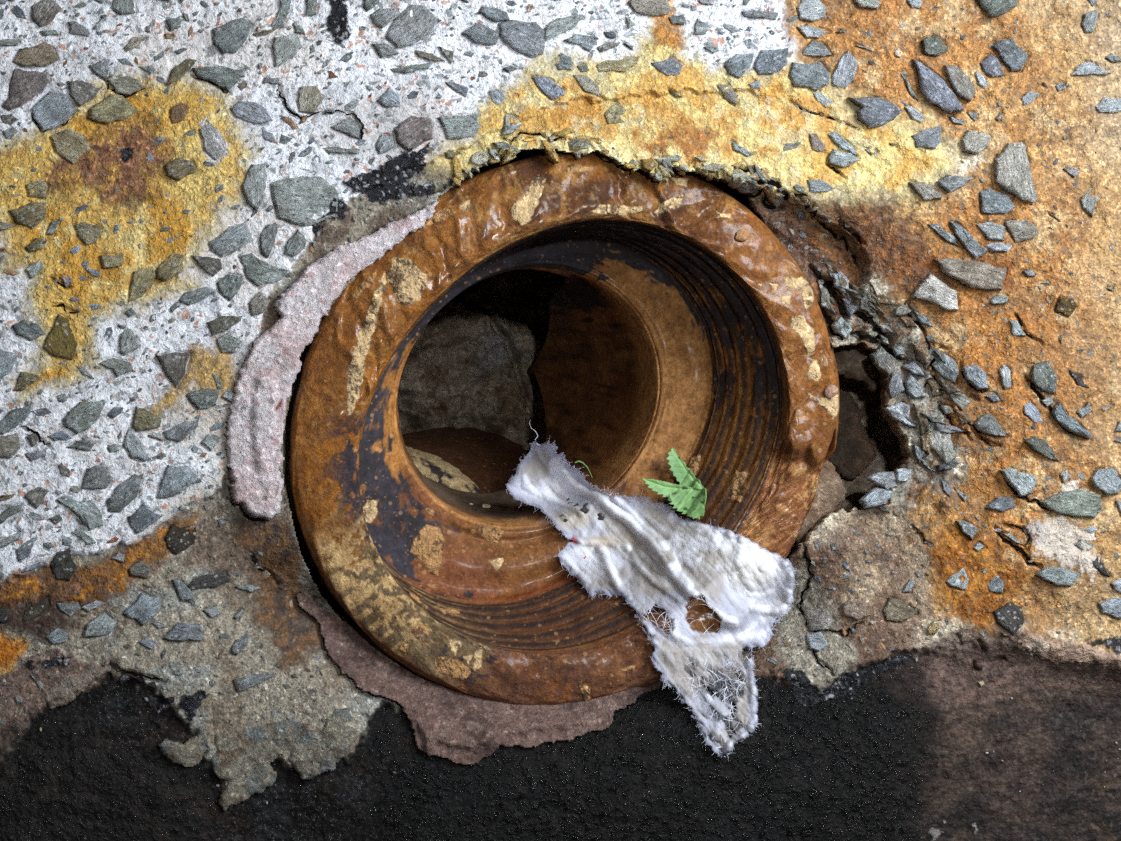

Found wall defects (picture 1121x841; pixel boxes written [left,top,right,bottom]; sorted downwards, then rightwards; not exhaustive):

rust [0,77,253,401]
rust [431,0,1121,653]
spalling [758,271,972,473]
rust [0,520,194,675]
rust [239,519,324,667]
water stain [1018,633,1121,672]
water stain [0,738,211,841]
water stain [342,654,941,841]